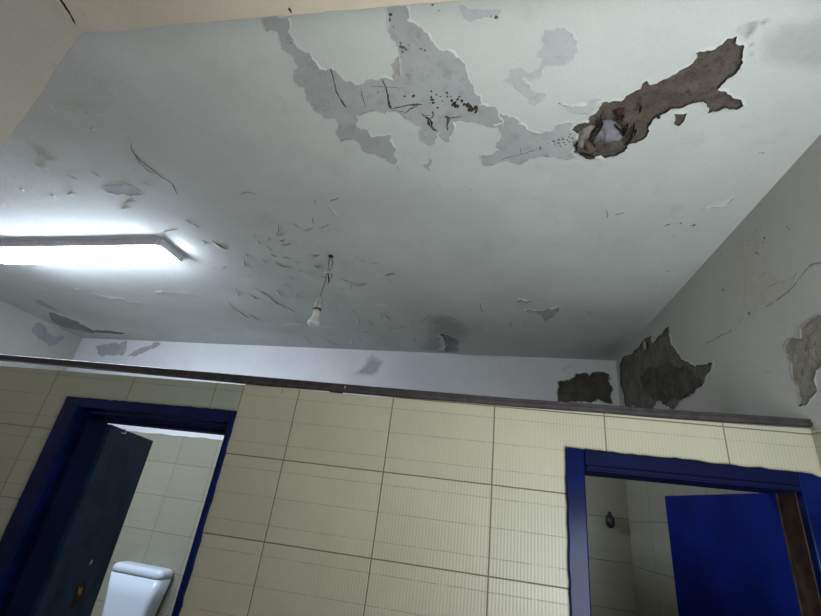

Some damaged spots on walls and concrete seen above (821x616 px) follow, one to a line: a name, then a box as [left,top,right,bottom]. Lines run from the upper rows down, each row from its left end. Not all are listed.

peeling [260,6,748,173]
crack [131,143,177,193]
peeling [31,312,161,357]
peeling [438,333,460,352]
flaking render [556,326,715,410]
flaking render [783,313,821,408]